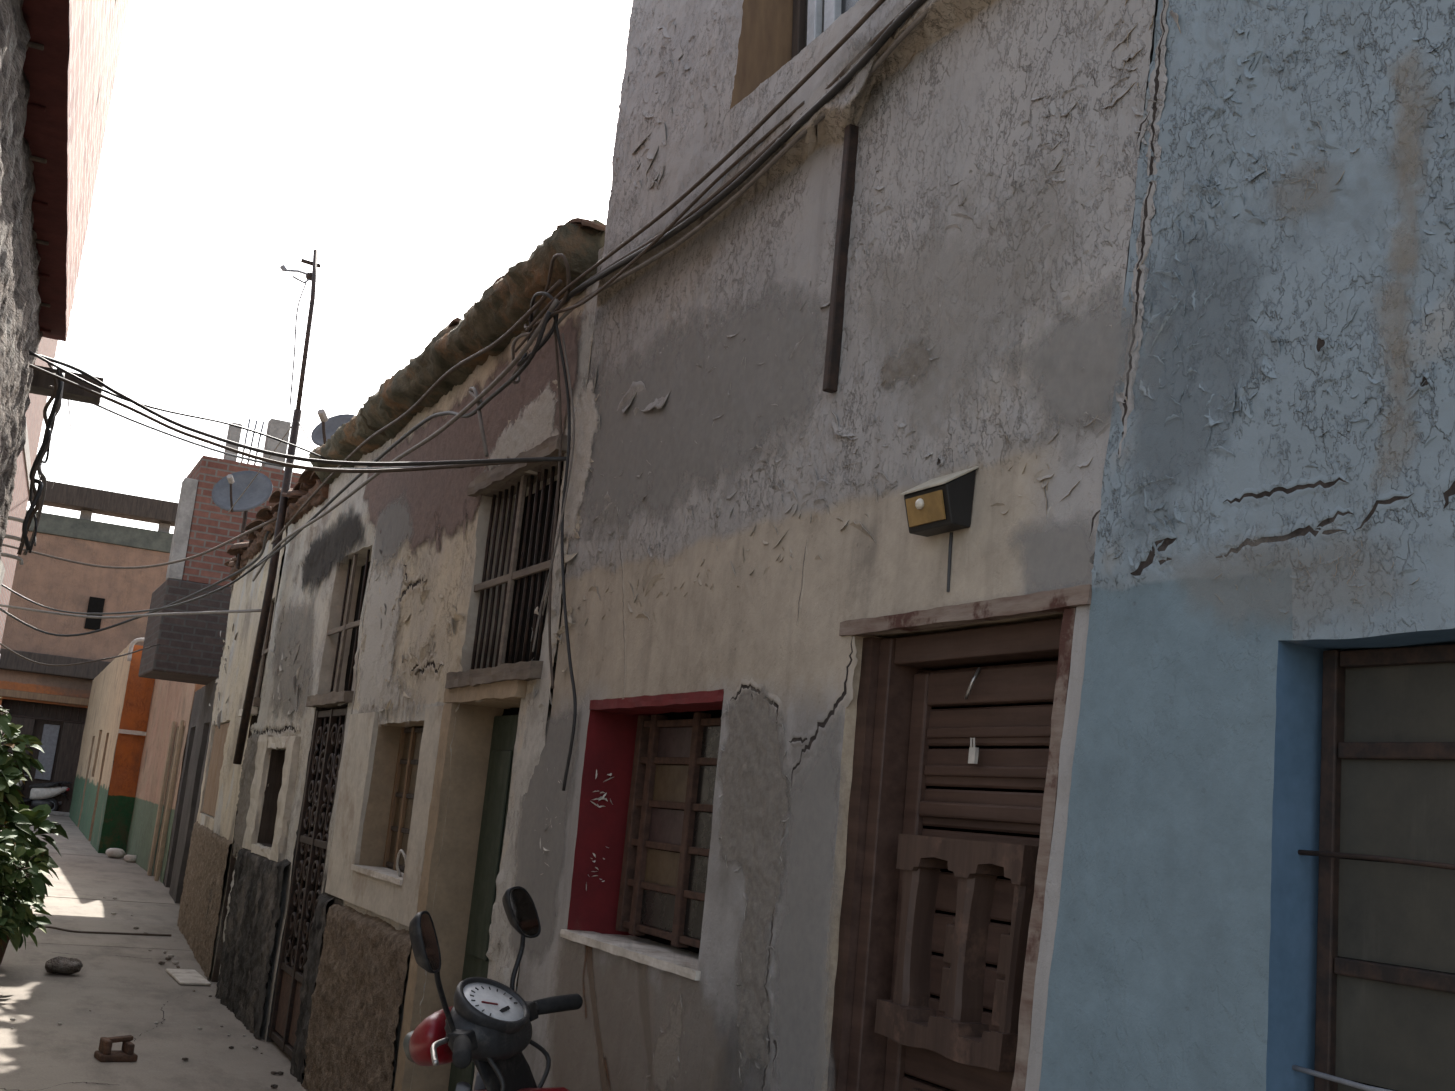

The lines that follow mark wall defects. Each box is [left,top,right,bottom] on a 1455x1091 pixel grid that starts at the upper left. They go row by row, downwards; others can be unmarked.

peeling [616,12,716,201]
peeling [1137,0,1359,270]
crack [1118,0,1169,458]
spalling [241,419,264,465]
peeling [617,381,670,414]
peeling [1147,324,1280,458]
peeling [361,315,600,718]
peeling [628,412,933,622]
crack [1083,508,1101,585]
crack [1130,521,1177,586]
crack [1215,469,1455,561]
spalling [232,730,271,858]